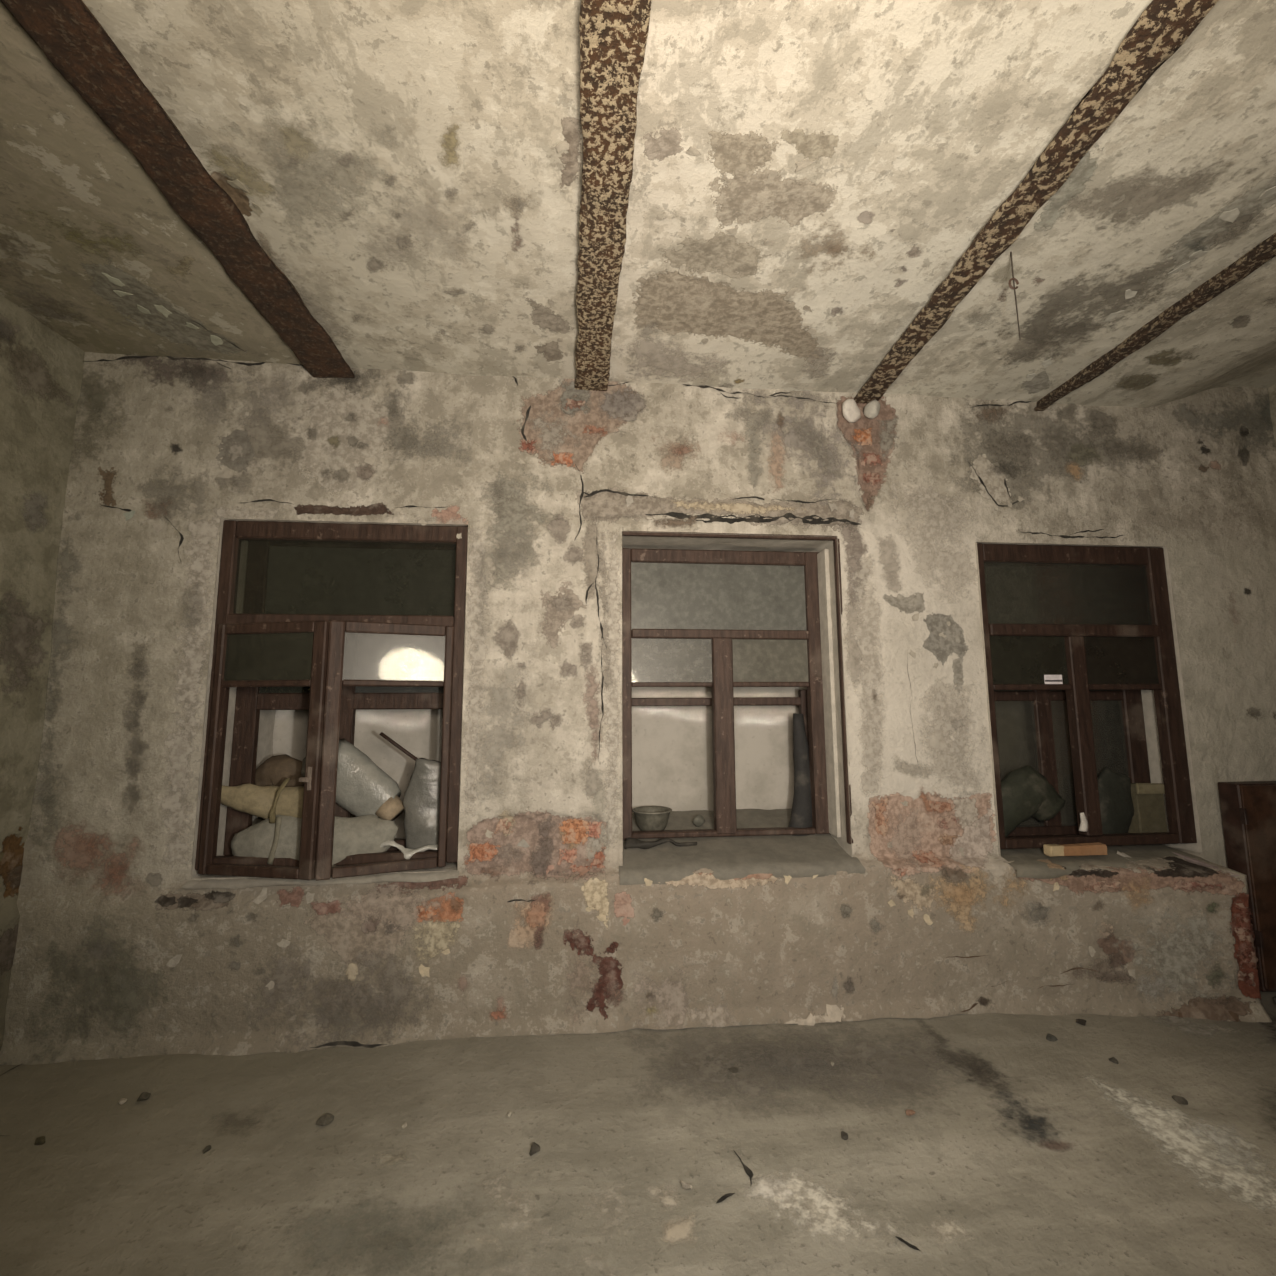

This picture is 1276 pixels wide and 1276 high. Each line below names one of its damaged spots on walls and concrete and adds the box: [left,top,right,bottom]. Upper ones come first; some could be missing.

spalling [517,378,898,532]
peeling [547,514,585,562]
peeling [493,581,592,706]
crack [575,464,608,757]
peeling [883,593,969,694]
peeling [531,702,561,729]
spalling [146,873,235,921]
spalling [246,810,635,981]
corrosion [508,893,553,949]
peeling [644,871,792,889]
spalling [867,792,997,925]
corrosion [563,929,624,1020]